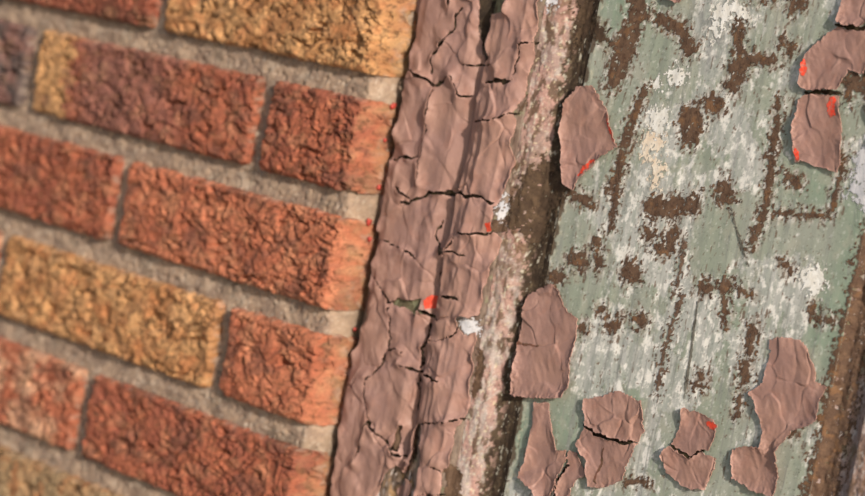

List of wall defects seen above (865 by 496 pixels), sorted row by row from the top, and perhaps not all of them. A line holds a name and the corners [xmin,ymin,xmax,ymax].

crack [410,0,539,98]
peeling [479,0,505,61]
peeling [558,85,617,190]
crack [804,88,842,96]
peeling [790,0,865,213]
crack [834,23,865,31]
crack [395,184,494,205]
crack [356,276,466,472]
peeling [510,284,645,496]
crack [583,424,634,484]
peeling [659,407,718,490]
peeling [730,337,827,496]